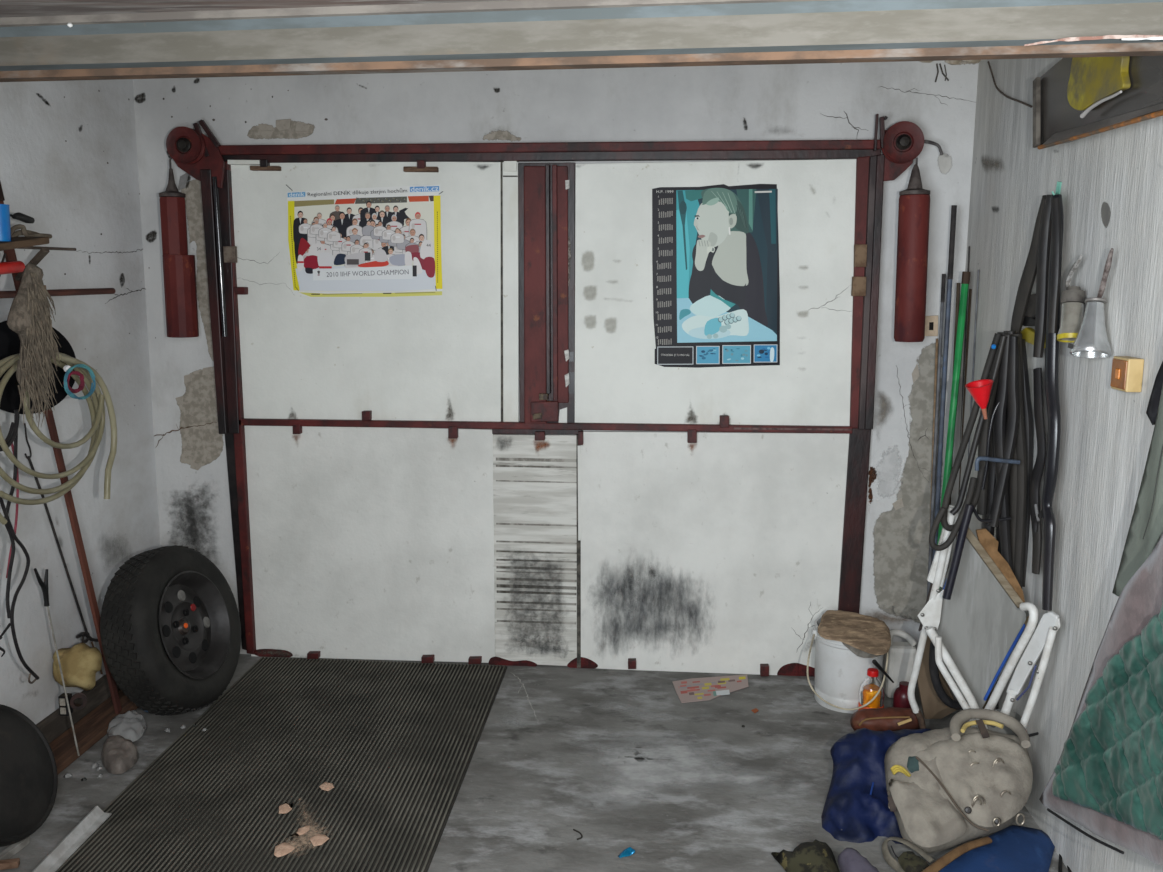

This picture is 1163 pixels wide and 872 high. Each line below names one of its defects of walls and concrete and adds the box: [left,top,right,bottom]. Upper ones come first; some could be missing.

peeling [247,119,315,139]
peeling [175,173,224,470]
water stain [168,490,215,558]
peeling [873,343,943,623]
water stain [511,560,560,651]
water stain [605,570,699,646]